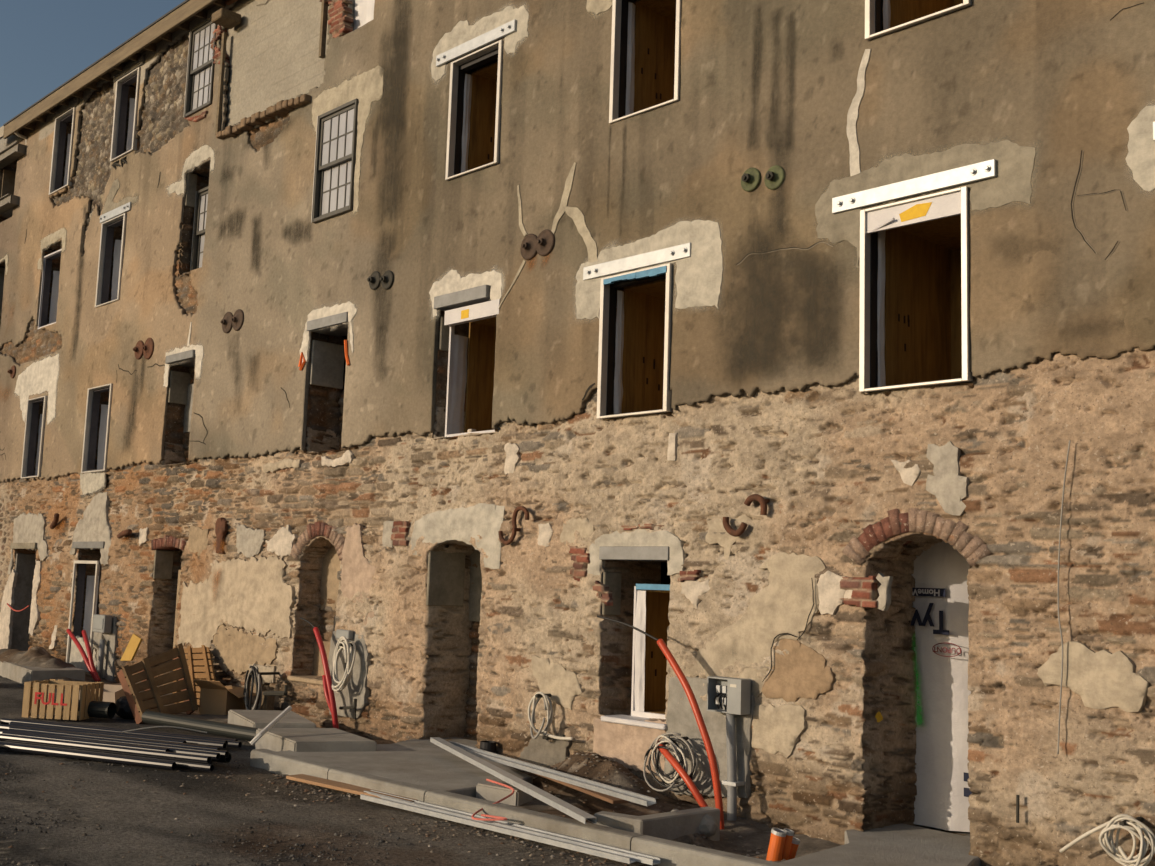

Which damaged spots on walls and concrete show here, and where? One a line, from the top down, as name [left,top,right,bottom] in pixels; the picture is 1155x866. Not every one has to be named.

spalling [136,33,190,154]
leakage [752,9,761,104]
leakage [772,14,794,166]
crack [847,49,871,176]
spalling [175,192,198,314]
crack [498,162,598,309]
crack [1071,150,1128,260]
spalling [0,320,62,365]